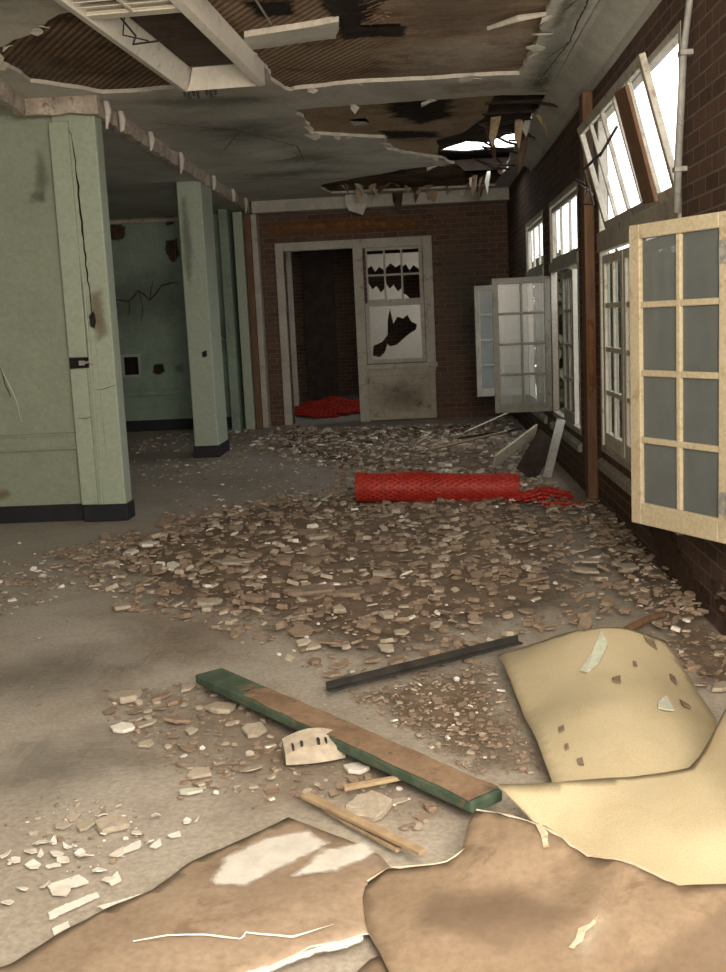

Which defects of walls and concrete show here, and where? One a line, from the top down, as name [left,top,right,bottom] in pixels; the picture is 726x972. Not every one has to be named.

spalling [0,12,171,95]
spalling [130,13,233,66]
spalling [206,0,553,94]
crack [542,0,589,77]
spalling [297,96,494,204]
peeling [110,224,126,241]
crack [68,120,115,477]
crack [116,282,179,320]